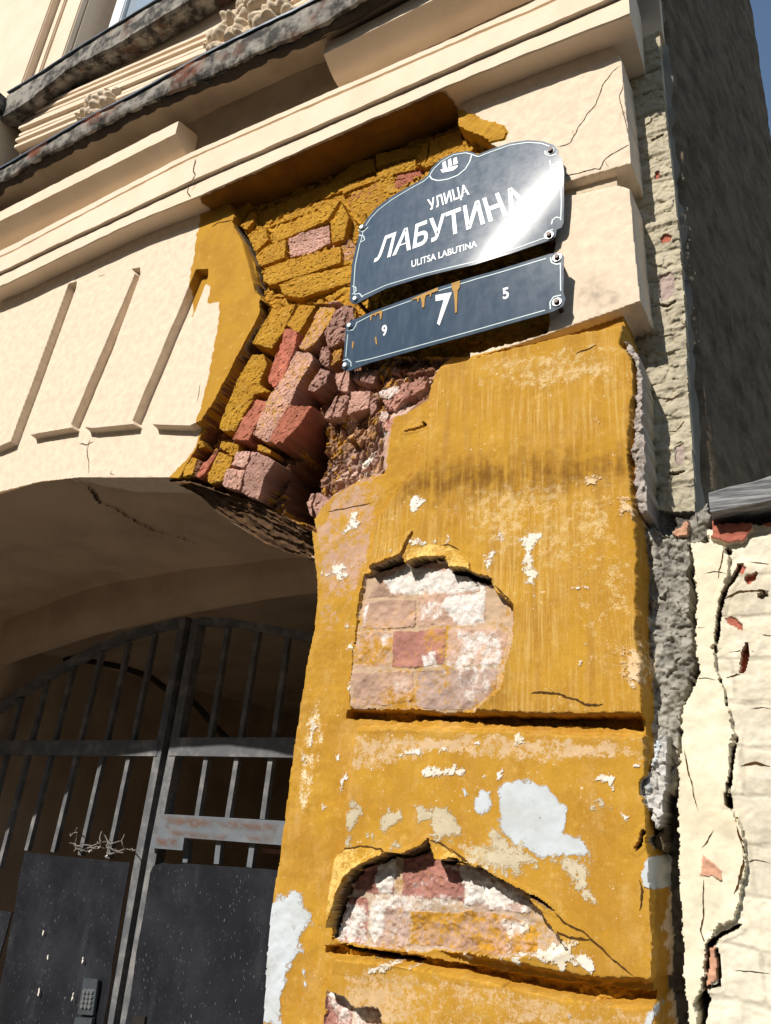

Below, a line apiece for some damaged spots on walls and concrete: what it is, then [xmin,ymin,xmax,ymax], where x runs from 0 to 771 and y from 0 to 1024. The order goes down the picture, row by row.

crack [558,66,664,176]
spalling [170,119,557,560]
flaking render [345,532,514,717]
crack [698,546,771,680]
peeling [394,748,465,777]
crack [531,691,602,706]
crack [725,736,768,801]
peeling [263,890,314,1024]
flaking render [337,770,597,975]
crack [329,840,633,976]
crack [700,880,770,988]
crack [702,826,769,893]